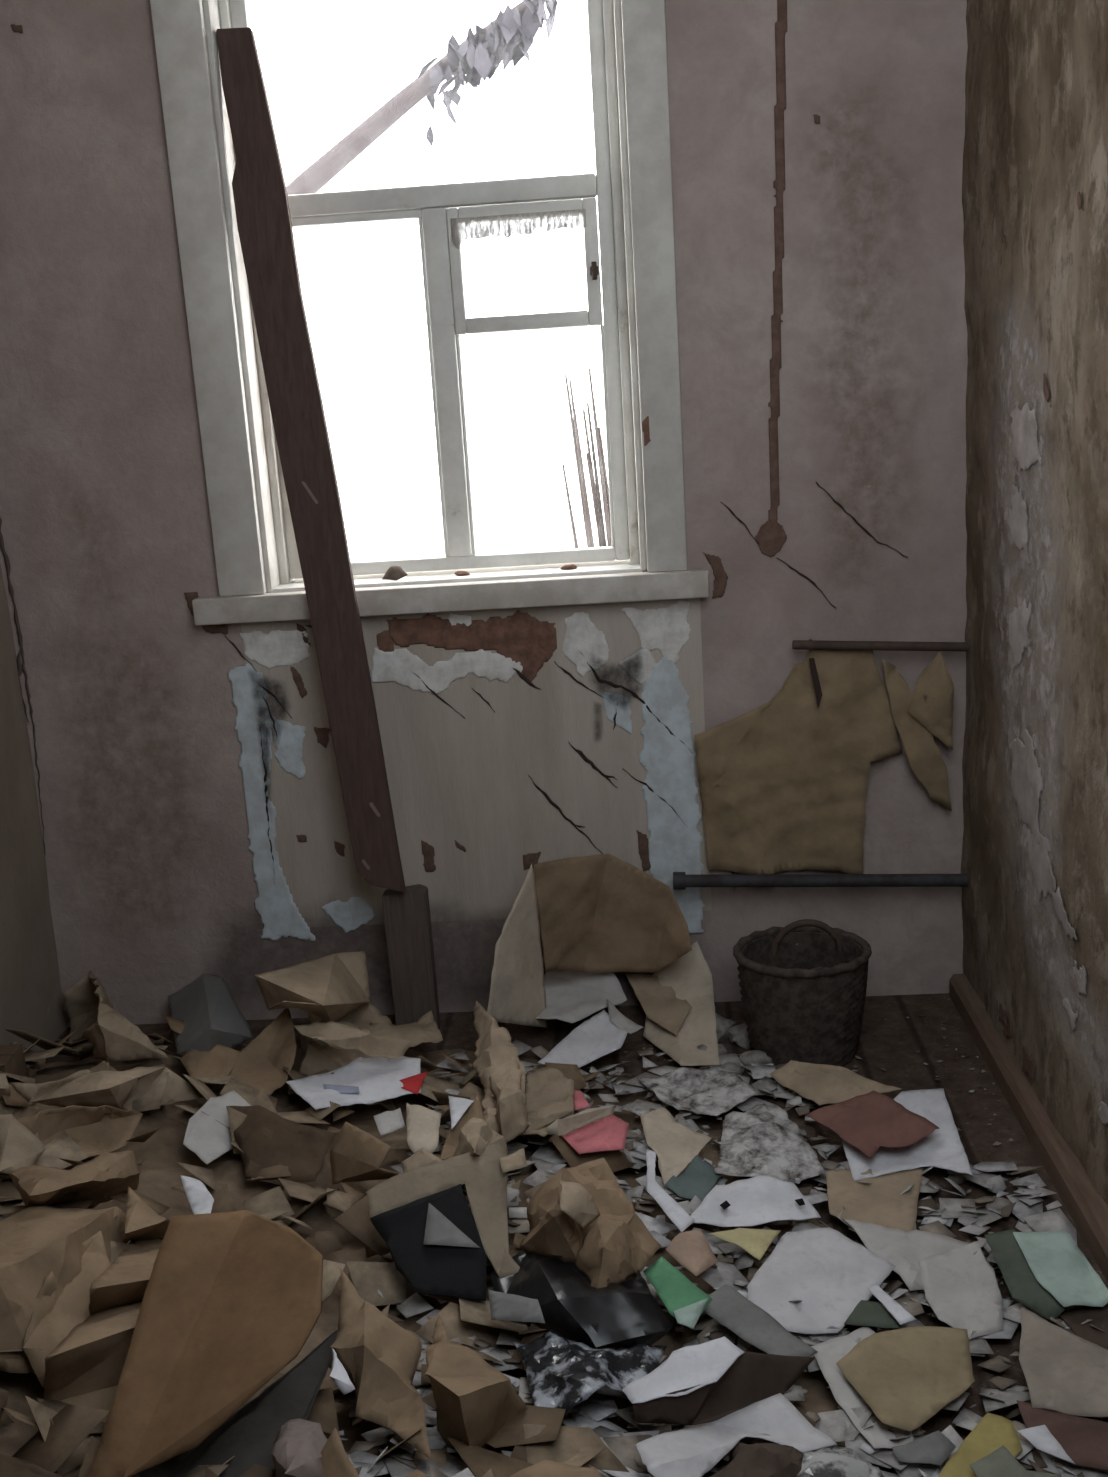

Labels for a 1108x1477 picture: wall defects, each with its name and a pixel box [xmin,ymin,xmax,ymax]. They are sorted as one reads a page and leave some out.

crack [0,516,46,855]
peeling [184,592,330,941]
peeling [322,896,375,933]
peeling [371,600,705,934]
peeling [995,312,1101,1081]